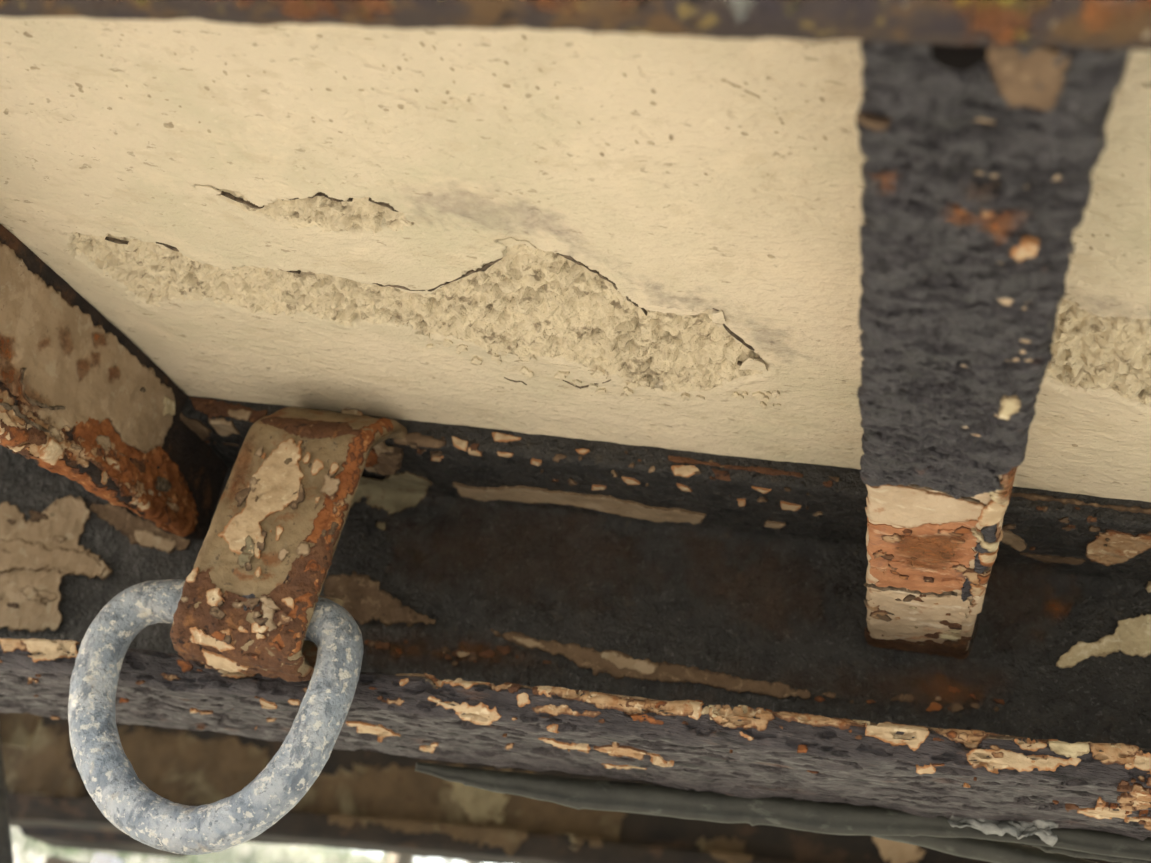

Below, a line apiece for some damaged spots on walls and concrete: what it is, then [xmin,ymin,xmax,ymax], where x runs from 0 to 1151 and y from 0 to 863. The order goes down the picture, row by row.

peeling [0,483,190,697]
rust [0,333,199,537]
peeling [0,242,268,466]
peeling [161,627,255,681]
rust [170,417,393,682]
spalling [72,232,781,410]
peeling [291,742,627,856]
peeling [452,459,706,525]
peeling [396,629,1151,831]
rust [867,517,981,595]
peeling [855,41,1151,646]
peeling [1056,614,1151,669]